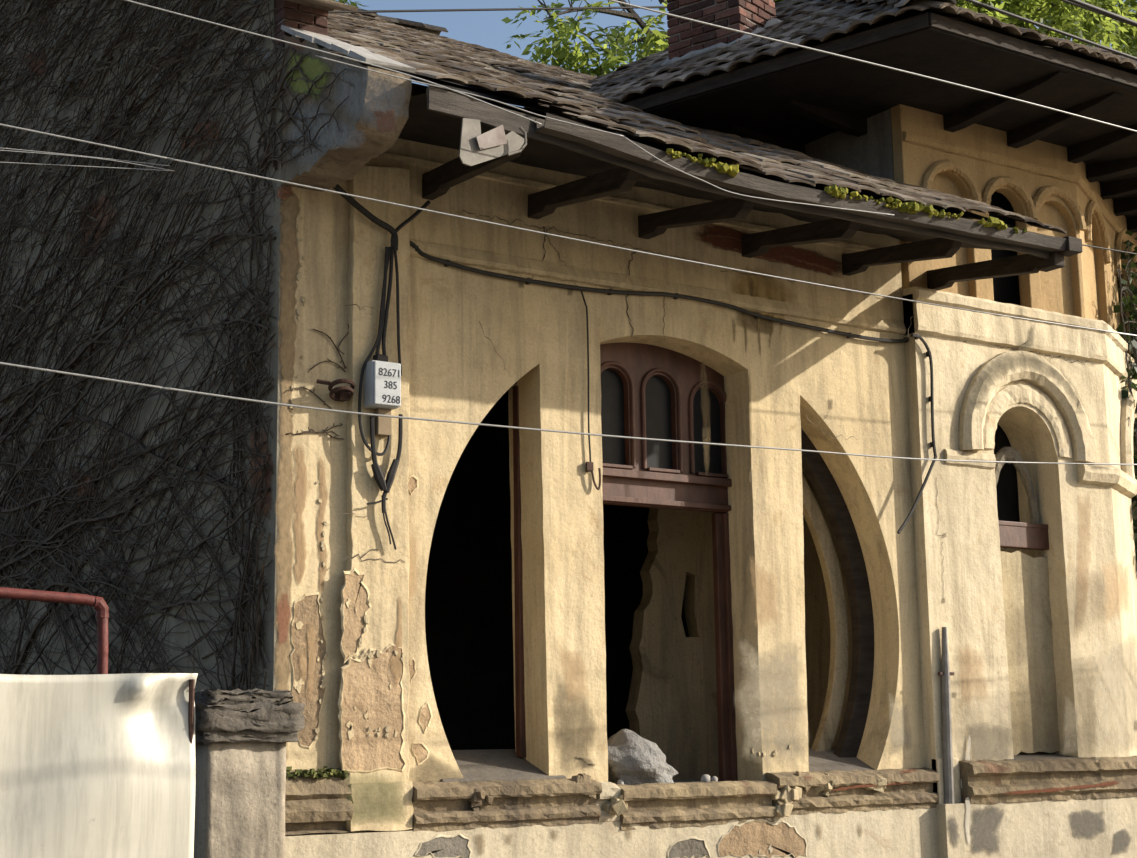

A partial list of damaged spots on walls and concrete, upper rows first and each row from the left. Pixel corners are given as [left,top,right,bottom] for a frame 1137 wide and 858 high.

crack [457,210,914,340]
flaking render [250,186,433,774]
crack [344,549,405,563]
leakage [560,693,590,756]
flaking render [414,833,473,858]
flaking render [666,819,807,858]